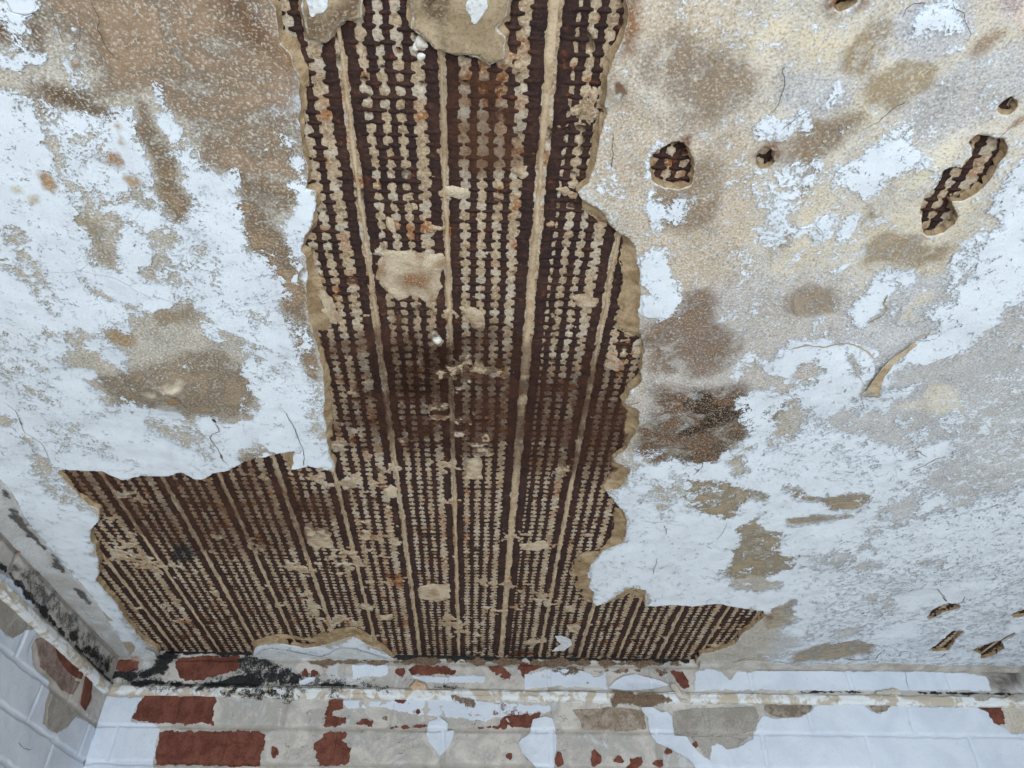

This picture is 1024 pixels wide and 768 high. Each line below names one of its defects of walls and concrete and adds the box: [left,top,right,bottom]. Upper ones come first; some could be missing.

corrosion [622,0,638,50]
corrosion [610,79,627,105]
damp [42,0,318,379]
flaking render [829,122,1008,236]
peeling [0,80,315,488]
damp [100,353,251,416]
damp [637,386,781,467]
damp [685,478,800,578]
peeling [0,599,279,768]
damp [0,563,690,747]
peeling [518,662,991,703]
peeling [573,704,1024,768]